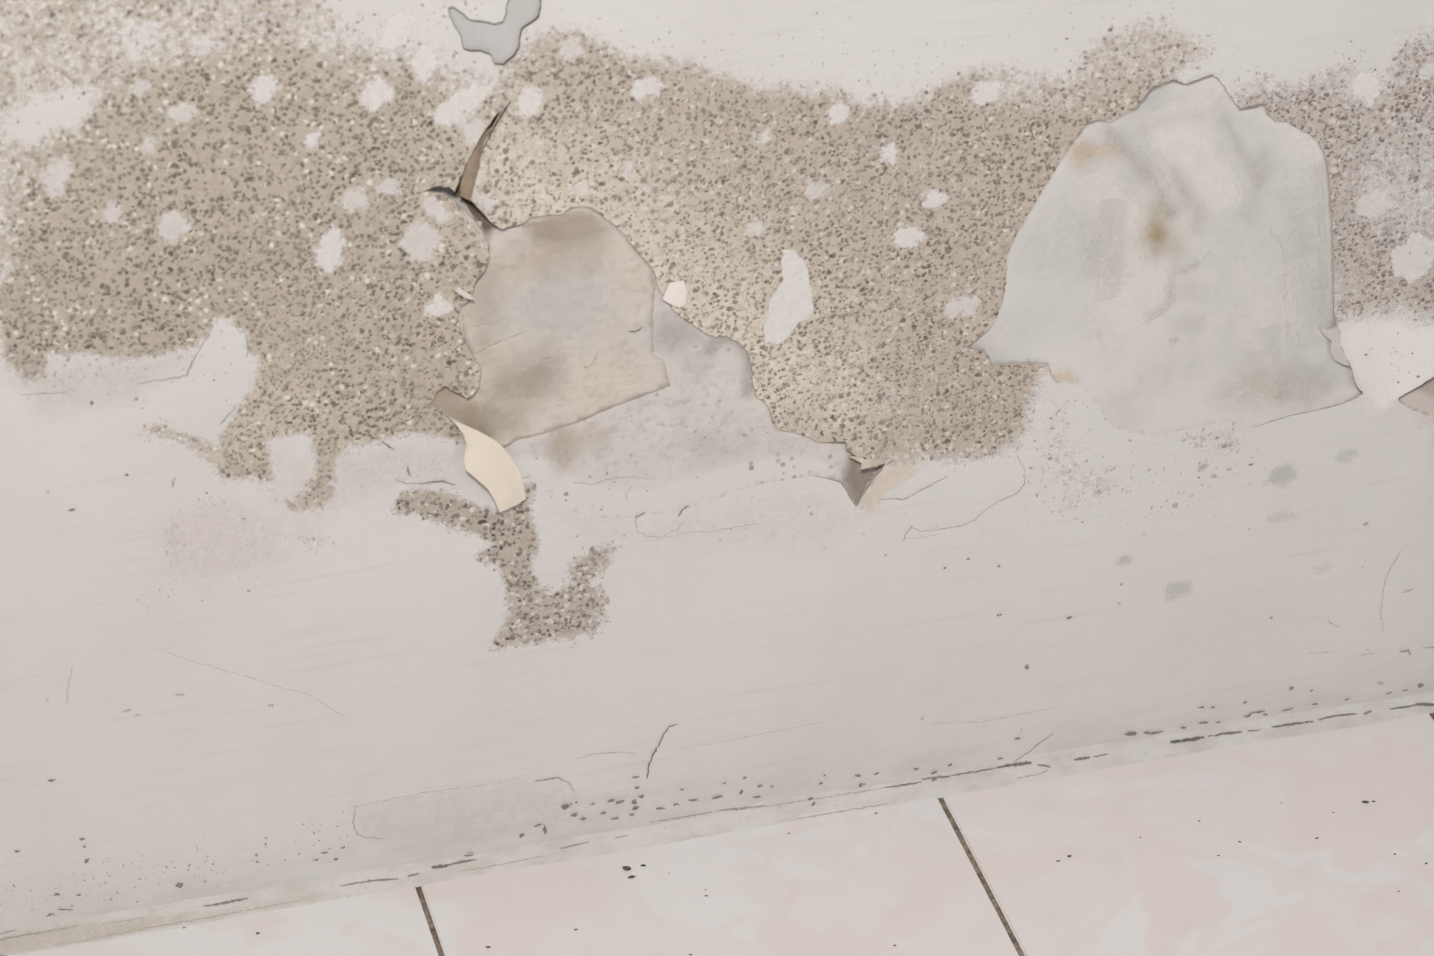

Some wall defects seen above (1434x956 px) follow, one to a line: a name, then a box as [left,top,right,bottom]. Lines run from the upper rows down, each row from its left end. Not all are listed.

peeling [448,0,541,65]
peeling [427,101,886,518]
peeling [970,75,1363,435]
peeling [1397,375,1434,416]